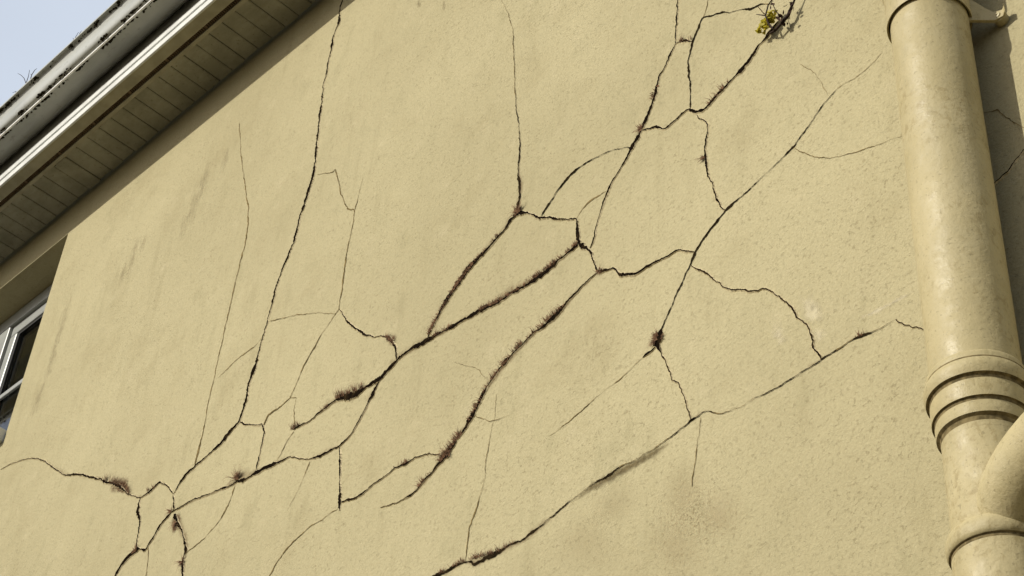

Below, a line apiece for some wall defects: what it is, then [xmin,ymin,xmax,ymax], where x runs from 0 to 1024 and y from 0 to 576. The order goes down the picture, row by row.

crack [1,0,595,576]
crack [288,0,901,430]
crack [895,319,924,331]
crack [985,109,1024,185]
crack [432,347,748,576]